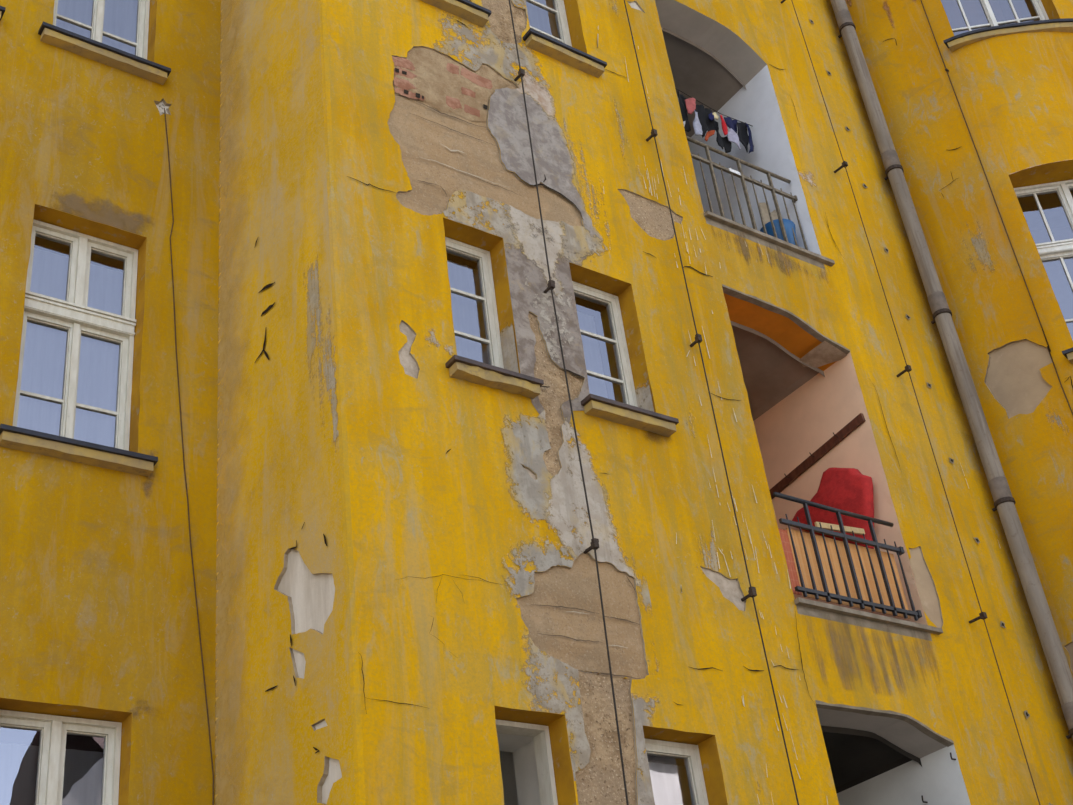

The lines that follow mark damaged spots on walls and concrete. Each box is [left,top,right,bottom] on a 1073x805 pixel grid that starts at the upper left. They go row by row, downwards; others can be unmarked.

spalling [618,189,683,241]
spalling [387,0,659,805]
spalling [984,339,1053,419]
spalling [274,548,335,635]
crack [396,574,502,658]
spalling [700,530,746,611]
spalling [909,546,943,628]
spalling [289,647,306,679]
damp [830,625,906,691]